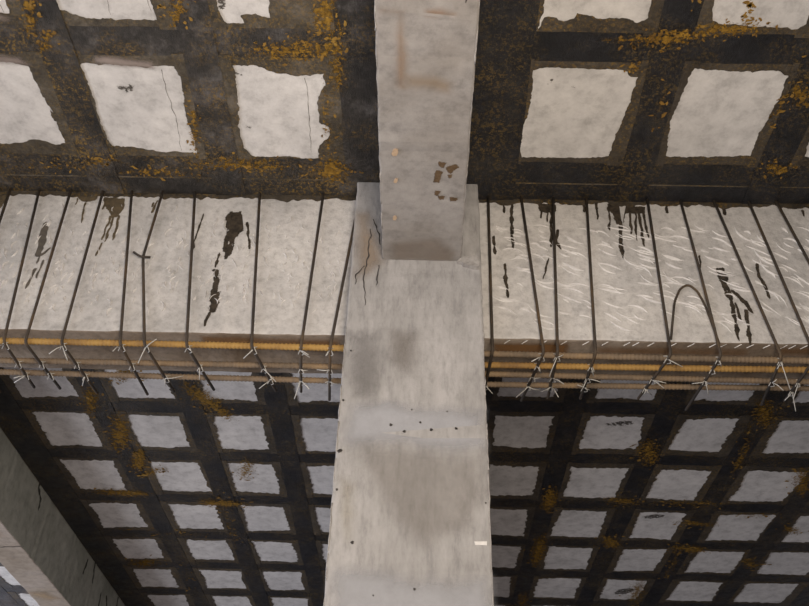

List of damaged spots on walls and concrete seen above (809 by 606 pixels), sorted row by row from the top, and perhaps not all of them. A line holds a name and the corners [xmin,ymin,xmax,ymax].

rust [19,0,60,59]
rust [602,1,778,53]
rust [120,0,364,185]
rust [769,76,809,128]
rust [759,159,798,179]
damp [25,222,51,289]
damp [0,191,356,256]
damp [204,211,251,326]
damp [479,200,809,258]
damp [755,263,771,299]
rust [76,381,169,478]
rust [174,382,239,422]